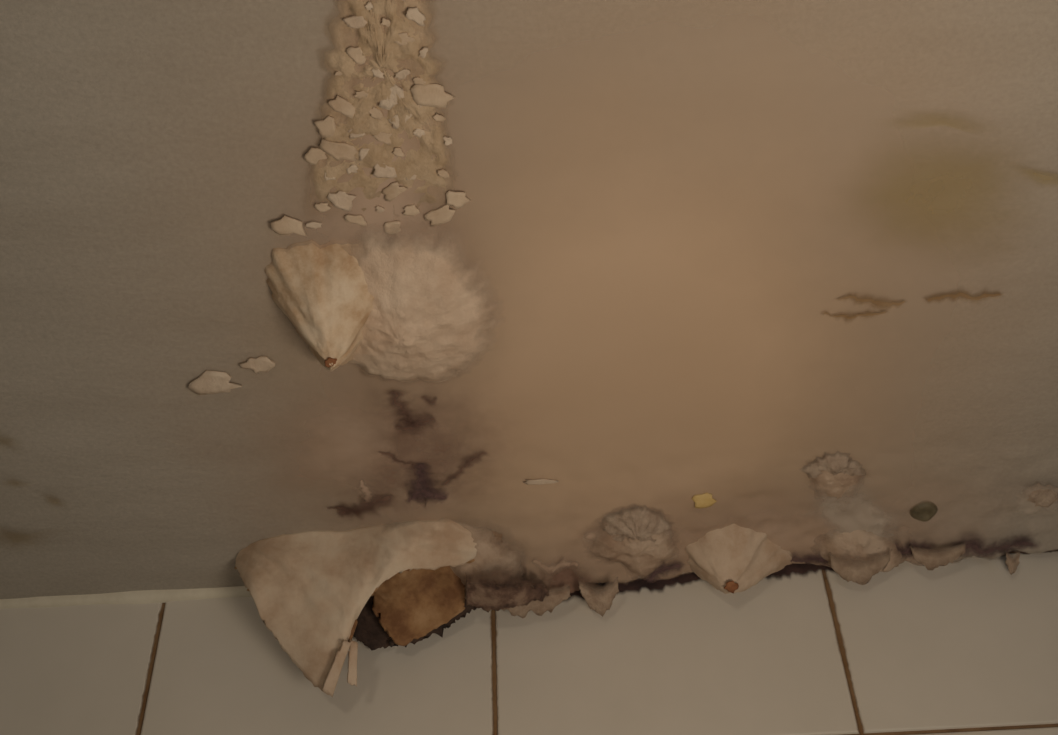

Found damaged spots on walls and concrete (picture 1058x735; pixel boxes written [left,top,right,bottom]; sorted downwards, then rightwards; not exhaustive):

peeling [271,0,471,245]
water stain [302,68,922,612]
peeling [188,356,275,395]
peeling [830,549,892,585]
peeling [910,543,966,570]
water stain [896,538,1058,557]
flaking render [234,518,502,697]